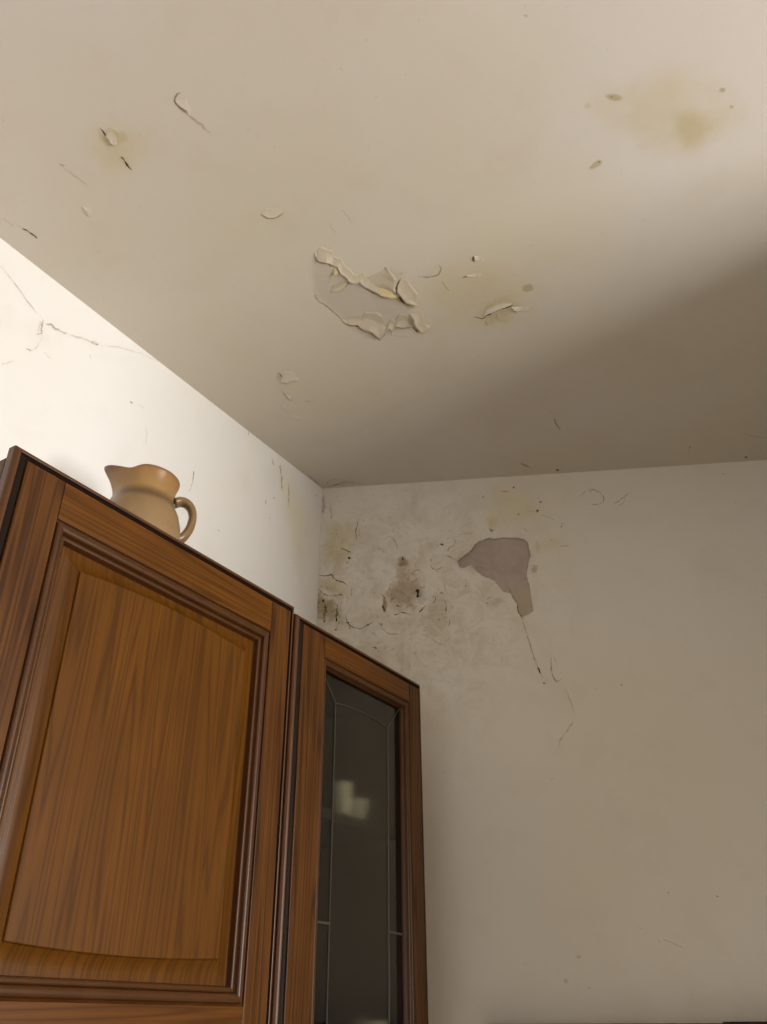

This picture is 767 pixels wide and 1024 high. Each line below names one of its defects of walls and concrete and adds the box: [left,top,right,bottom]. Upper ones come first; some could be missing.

peeling [314,247,431,340]
spalling [454,538,535,619]